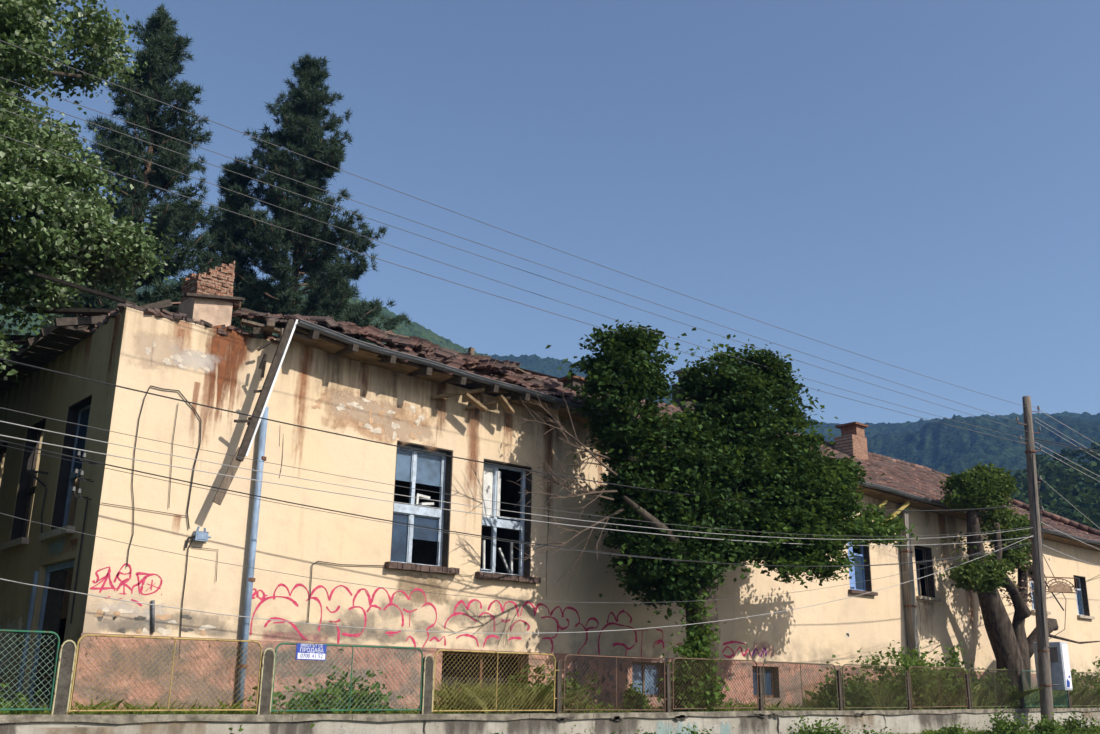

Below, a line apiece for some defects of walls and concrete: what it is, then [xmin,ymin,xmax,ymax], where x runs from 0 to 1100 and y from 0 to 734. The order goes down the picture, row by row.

peeling [139,335,212,372]
rust [192,325,251,427]
peeling [312,391,430,441]